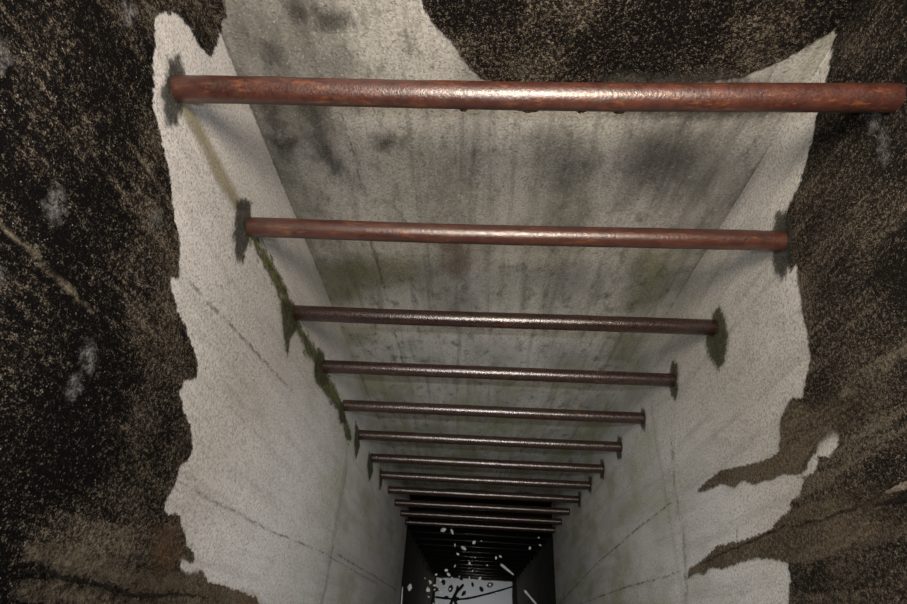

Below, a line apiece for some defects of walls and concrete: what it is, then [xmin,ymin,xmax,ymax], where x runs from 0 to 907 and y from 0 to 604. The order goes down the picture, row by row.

leakage [281,300,298,358]
leakage [706,307,728,371]